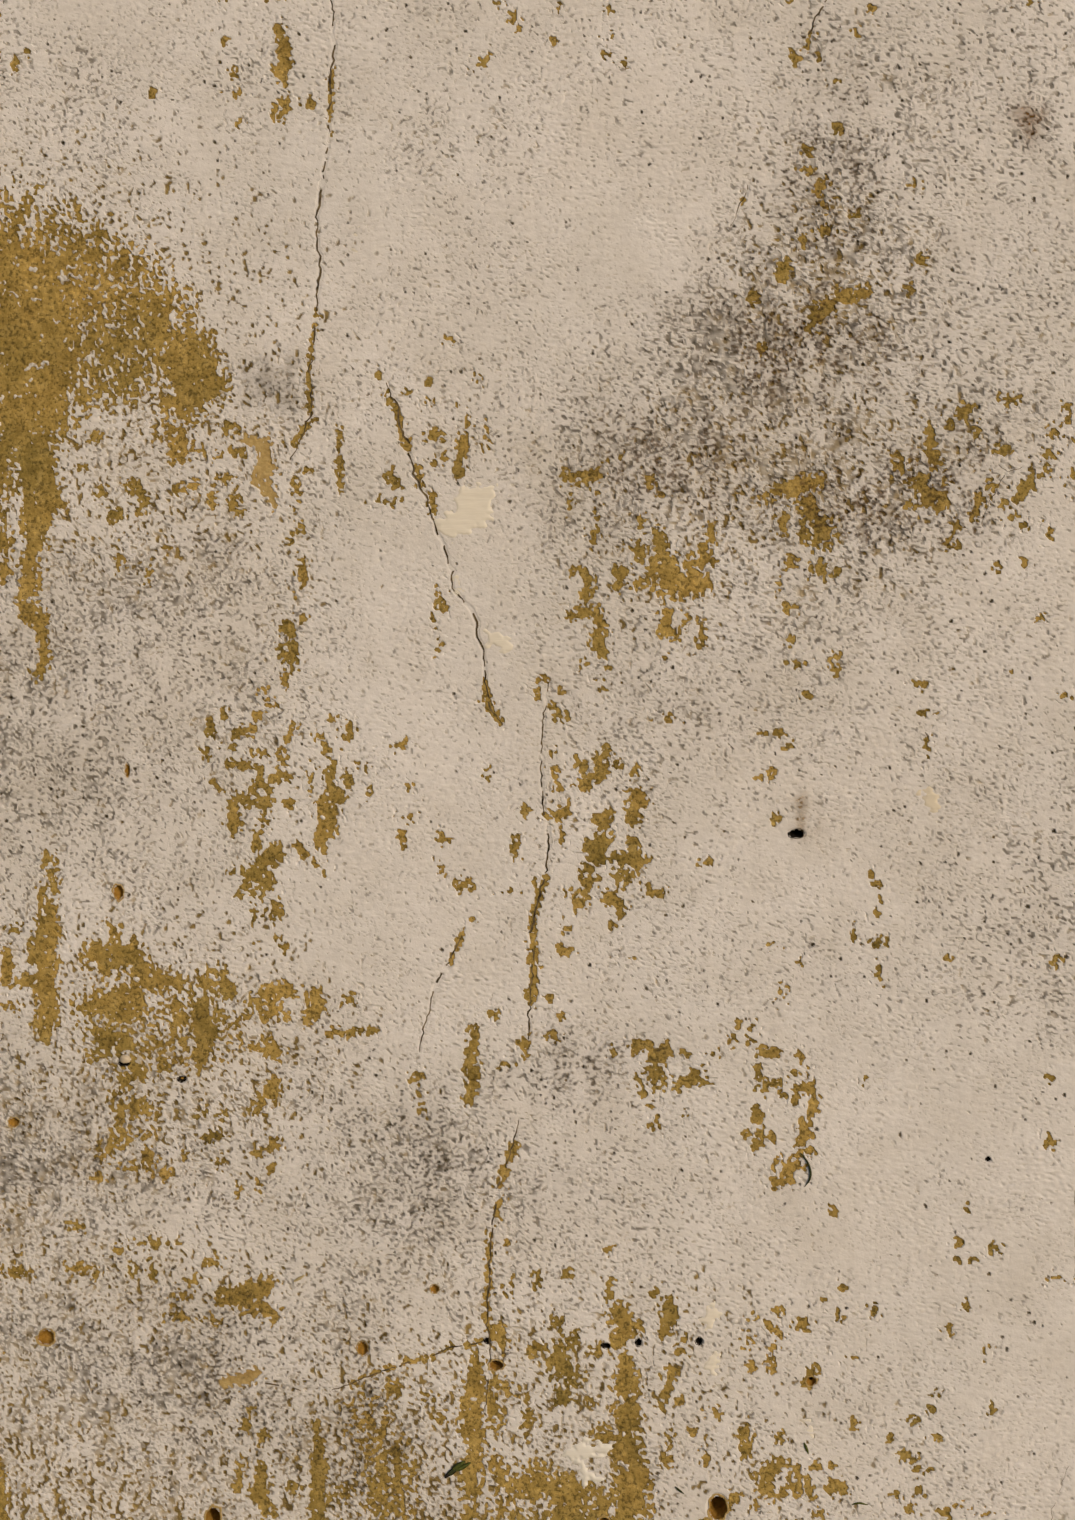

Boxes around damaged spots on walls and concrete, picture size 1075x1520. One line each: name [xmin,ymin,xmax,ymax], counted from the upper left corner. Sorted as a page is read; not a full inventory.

crack [282,0,339,460]
damp [808,130,879,250]
peeling [0,168,374,956]
crack [374,365,505,727]
damp [592,273,892,515]
damp [797,430,987,550]
crack [523,682,553,1041]
peeling [549,742,669,958]
peeling [0,849,380,1200]
peeling [606,1018,823,1191]
crack [265,1120,522,1408]
peeling [213,1276,724,1520]